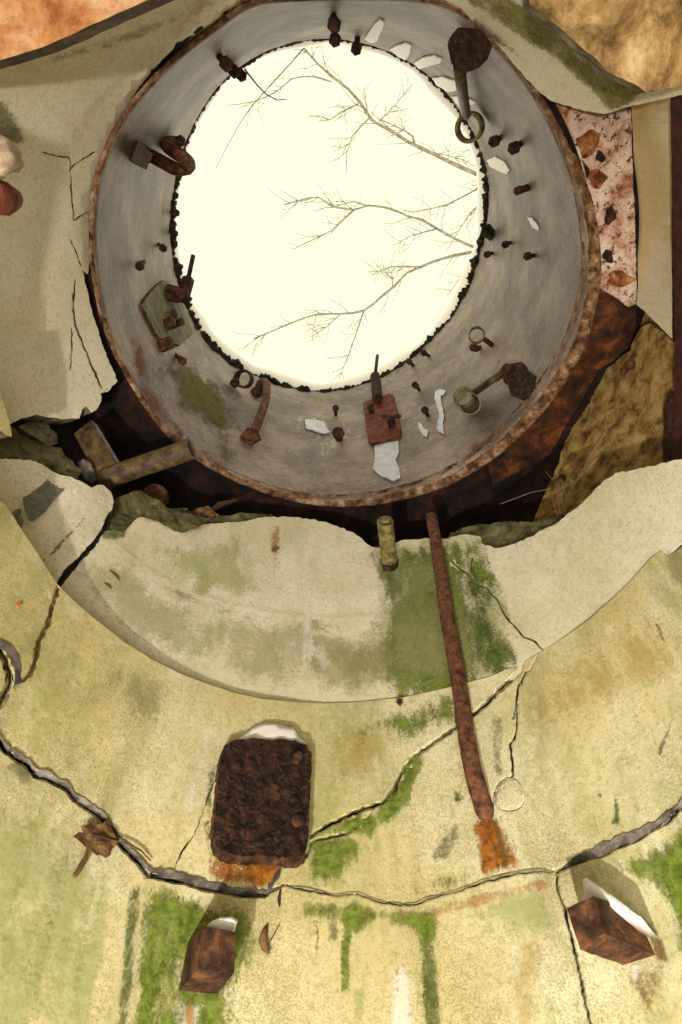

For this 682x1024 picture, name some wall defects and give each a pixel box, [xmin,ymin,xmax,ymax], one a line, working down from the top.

crack [43,152,102,388]
corrosion [89,0,341,443]
corrosion [195,0,637,507]
spalling [98,490,273,534]
spalling [446,515,564,548]
crack [0,504,118,710]
water stain [463,564,516,678]
water stain [119,889,165,1024]
corrosion [209,860,281,886]
crack [0,674,682,1023]
corrosion [473,819,517,875]
water stain [653,841,682,951]